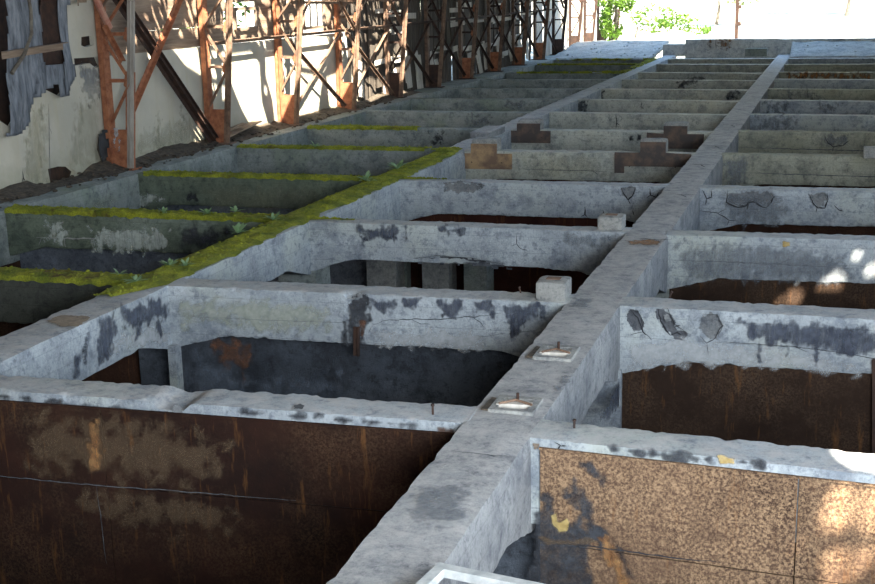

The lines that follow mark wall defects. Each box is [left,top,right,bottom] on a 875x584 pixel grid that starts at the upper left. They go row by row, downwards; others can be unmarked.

crack [622,172,774,225]
crack [761,173,875,211]
damp [74,298,167,378]
crack [369,313,539,339]
damp [475,300,545,338]
spalling [626,309,645,331]
spalling [655,308,688,340]
spalling [699,312,724,340]
damp [731,318,875,368]
rust [89,420,100,470]
rust [580,462,605,487]
rust [529,478,630,584]